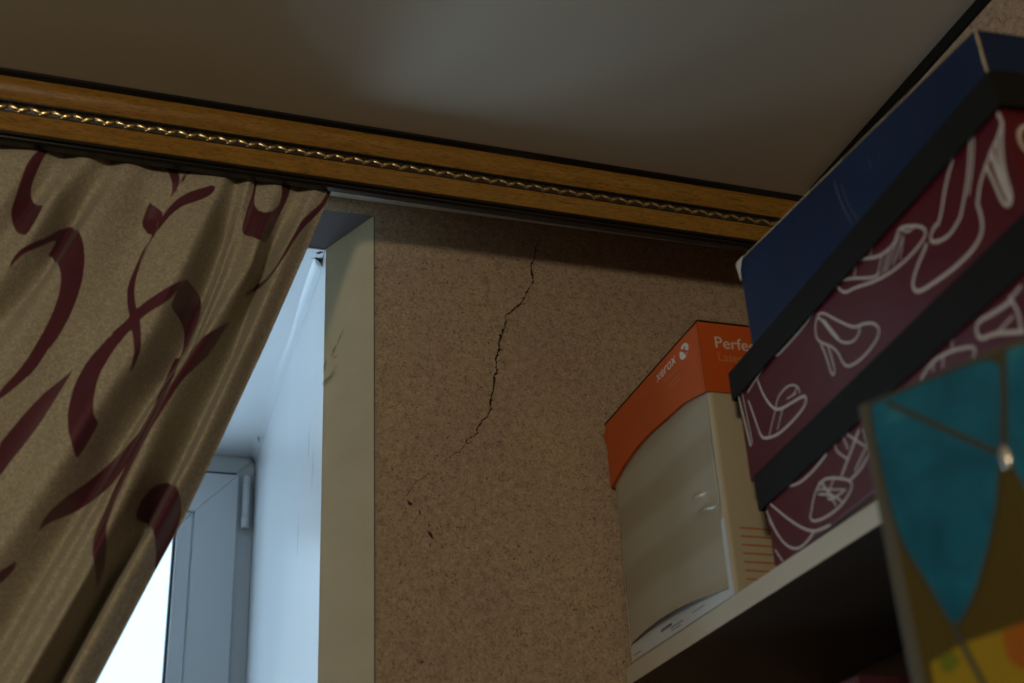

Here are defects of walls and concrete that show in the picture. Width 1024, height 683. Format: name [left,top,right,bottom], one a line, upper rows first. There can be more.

crack [406,240,541,496]